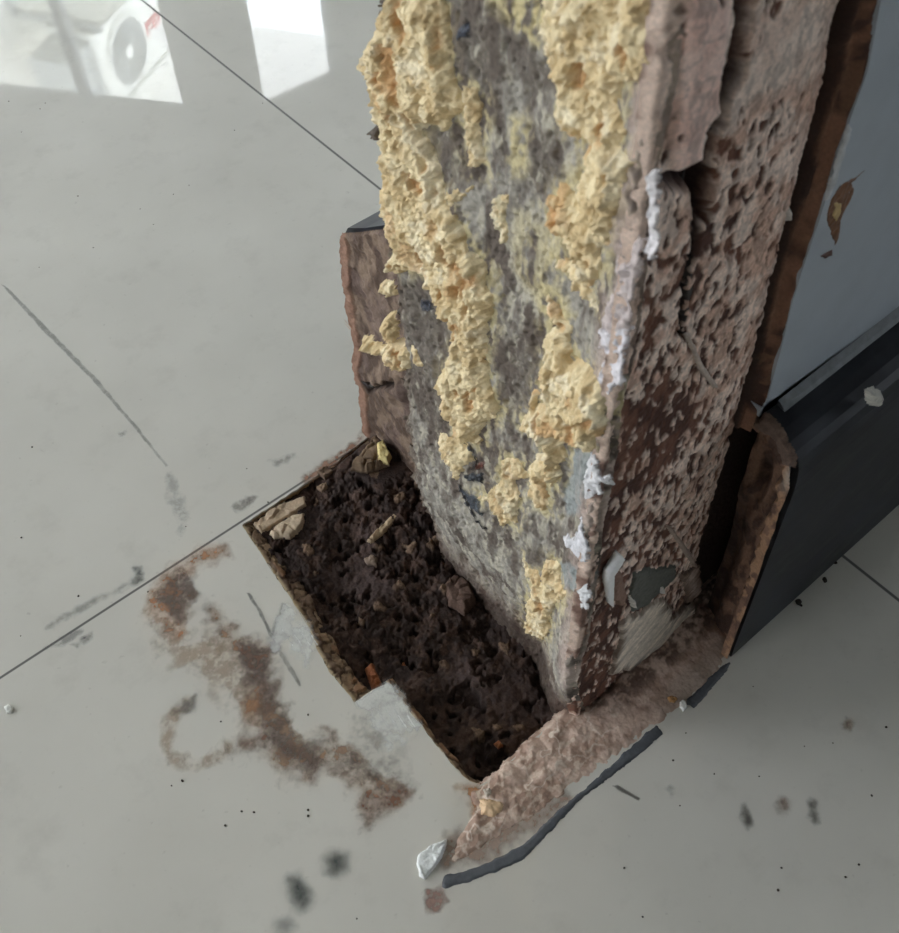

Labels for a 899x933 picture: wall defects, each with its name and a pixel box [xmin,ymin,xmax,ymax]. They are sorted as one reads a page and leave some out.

flaking render [397,0,838,716]
crack [677,223,694,334]
rust [148,547,224,639]
rust [209,608,409,825]
spalling [242,521,482,786]